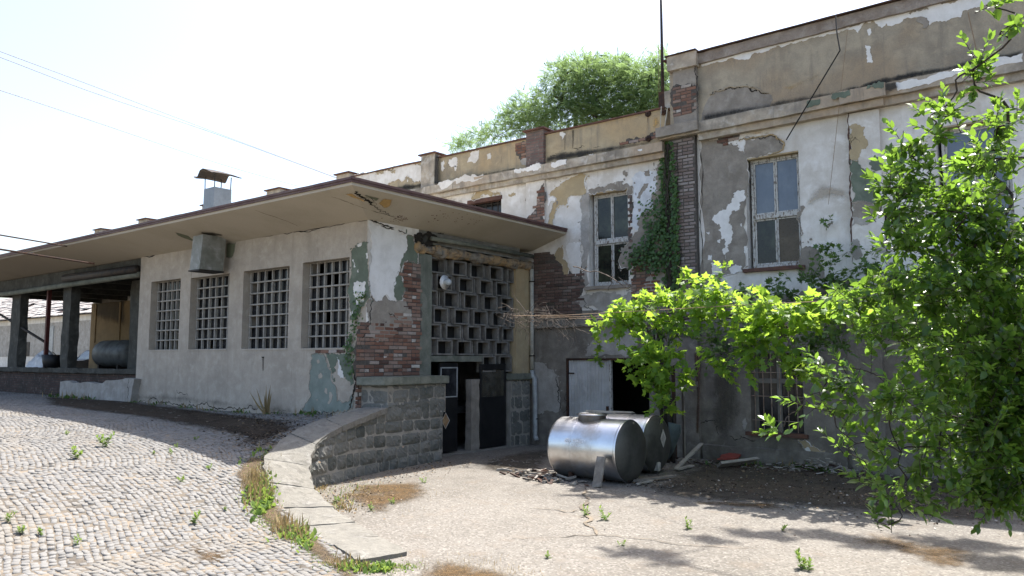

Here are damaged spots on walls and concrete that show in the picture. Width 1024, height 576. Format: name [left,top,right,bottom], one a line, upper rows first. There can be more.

peeling [701,0,991,67]
spalling [670,84,773,121]
peeling [437,150,516,201]
peeling [514,141,567,173]
peeling [849,123,882,226]
crack [261,191,406,237]
flaking render [698,134,785,288]
flaking render [527,162,668,358]
flaking render [302,210,480,414]